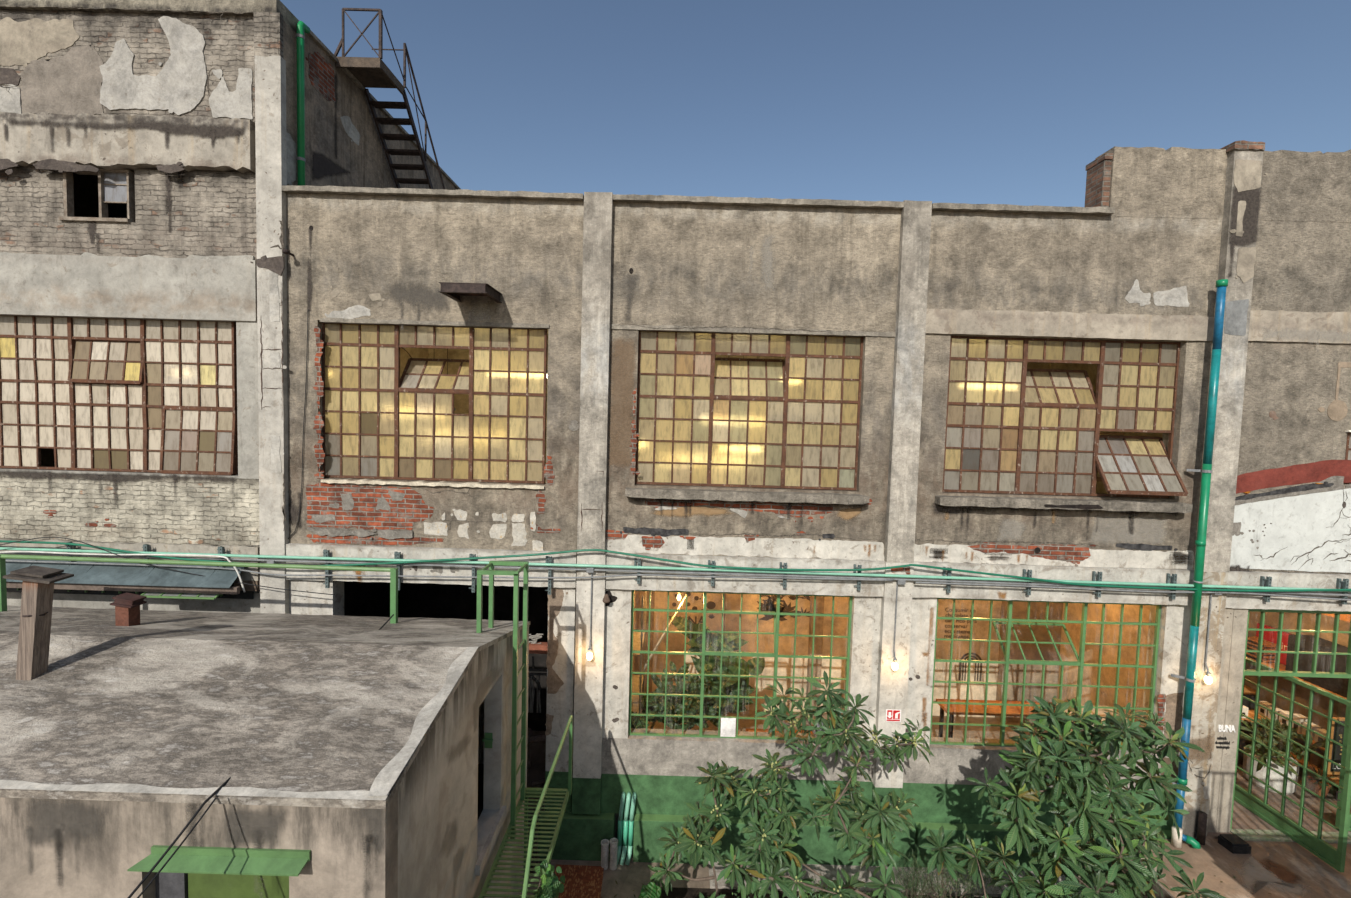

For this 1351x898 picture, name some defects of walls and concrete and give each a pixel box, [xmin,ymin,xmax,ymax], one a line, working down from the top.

peeling [0,16,253,120]
spalling [0,159,99,175]
spalling [157,162,185,174]
peeling [1229,159,1268,283]
peeling [1125,279,1190,307]
spalling [306,293,560,551]
spalling [410,566,459,574]
spalling [581,504,665,550]
spalling [645,500,835,541]
spalling [968,542,1096,566]
crack [1255,489,1351,574]
peeling [546,588,568,694]